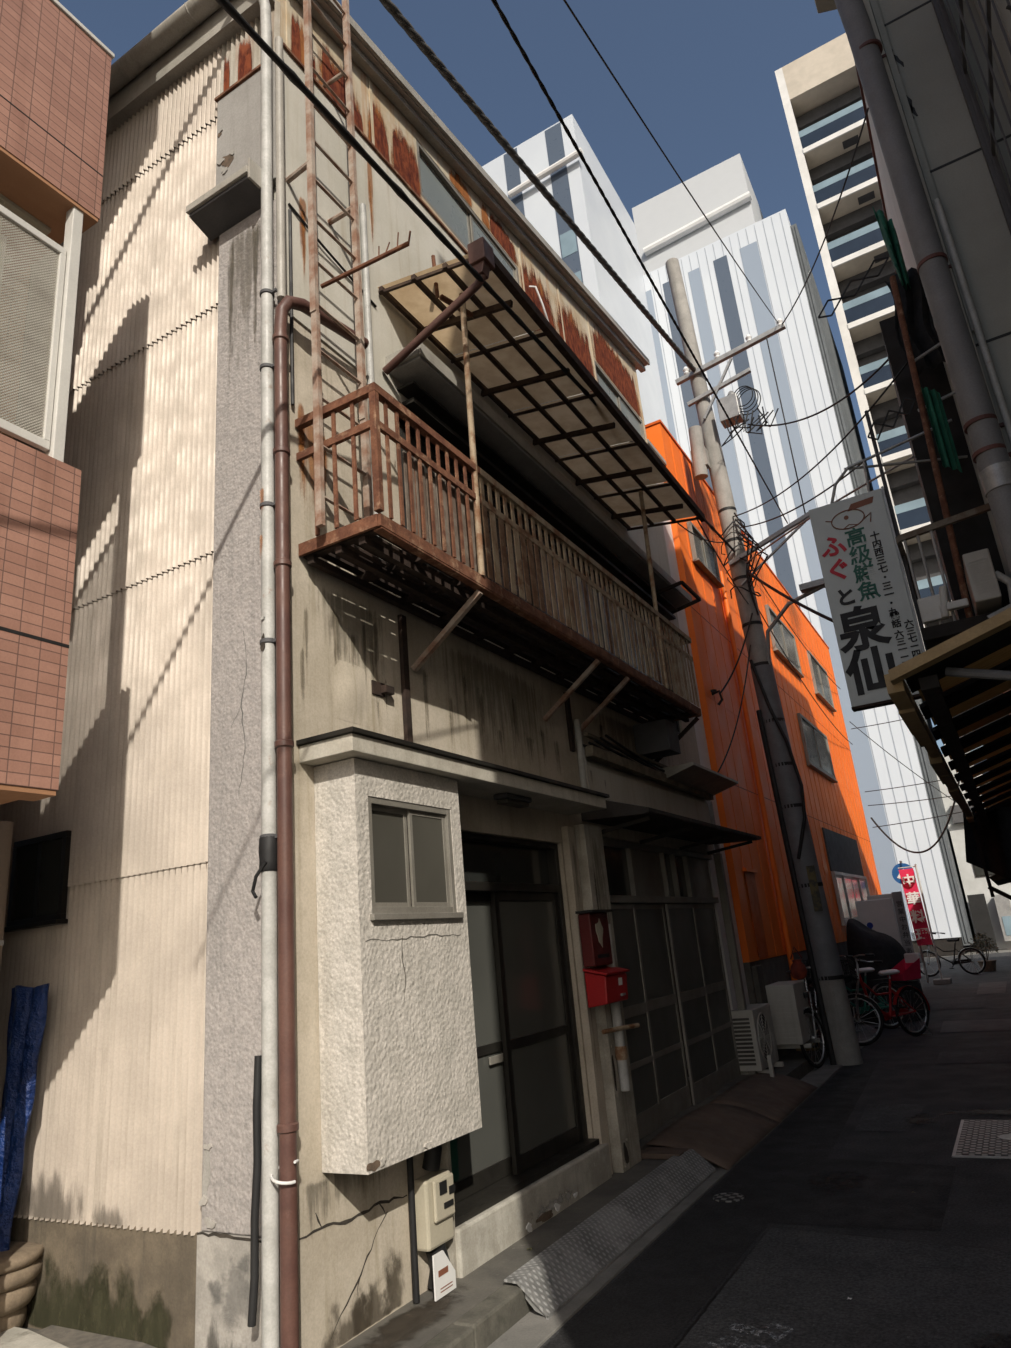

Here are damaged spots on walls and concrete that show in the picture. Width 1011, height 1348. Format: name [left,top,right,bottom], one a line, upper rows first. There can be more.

corrosion [223,40,252,91]
corrosion [291,15,421,236]
crack [197,1195,407,1339]